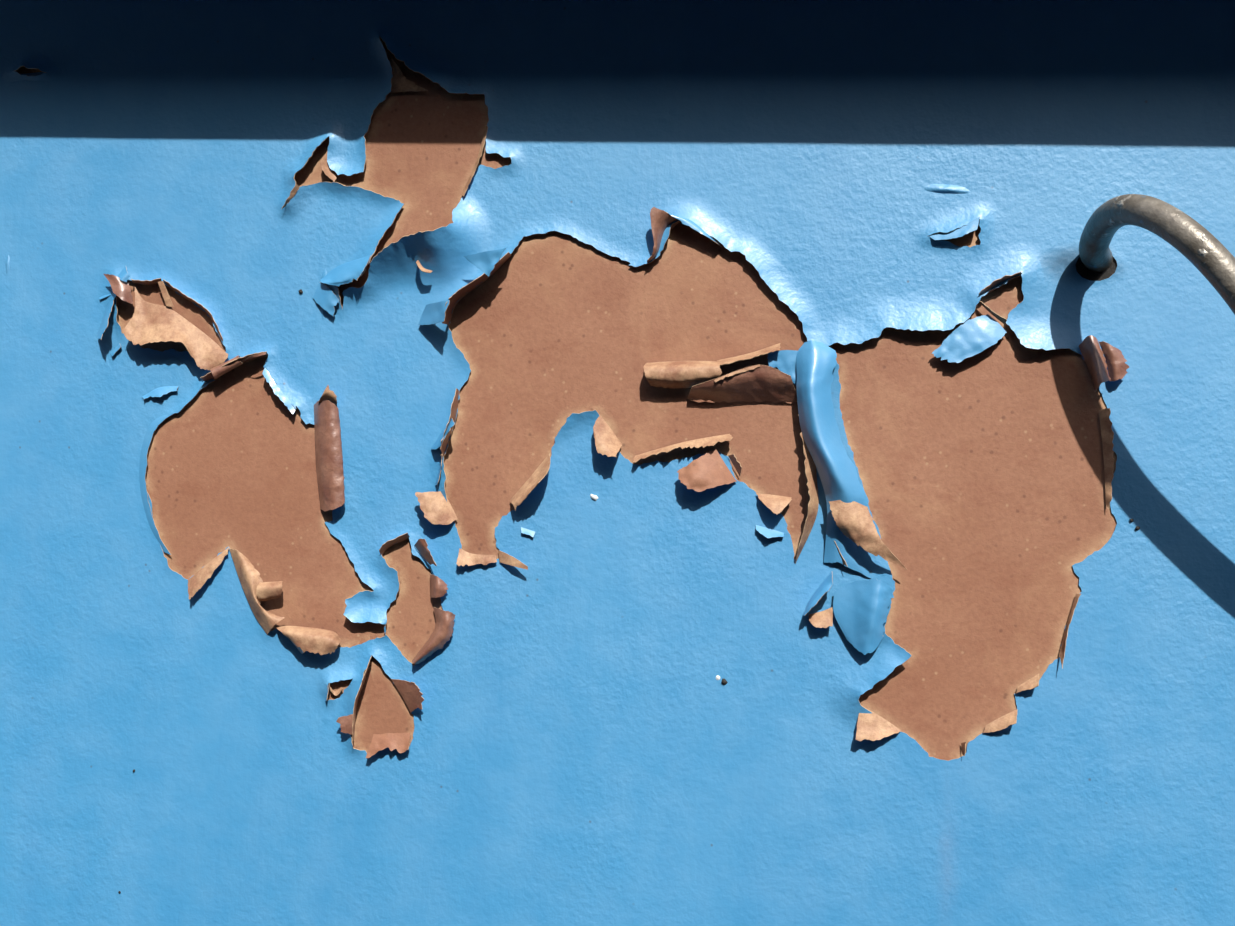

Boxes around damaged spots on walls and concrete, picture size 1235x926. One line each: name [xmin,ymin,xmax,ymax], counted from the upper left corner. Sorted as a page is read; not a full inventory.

peeling [282,38,511,316]
peeling [97,266,455,666]
peeling [415,207,1129,761]
peeling [325,656,424,758]